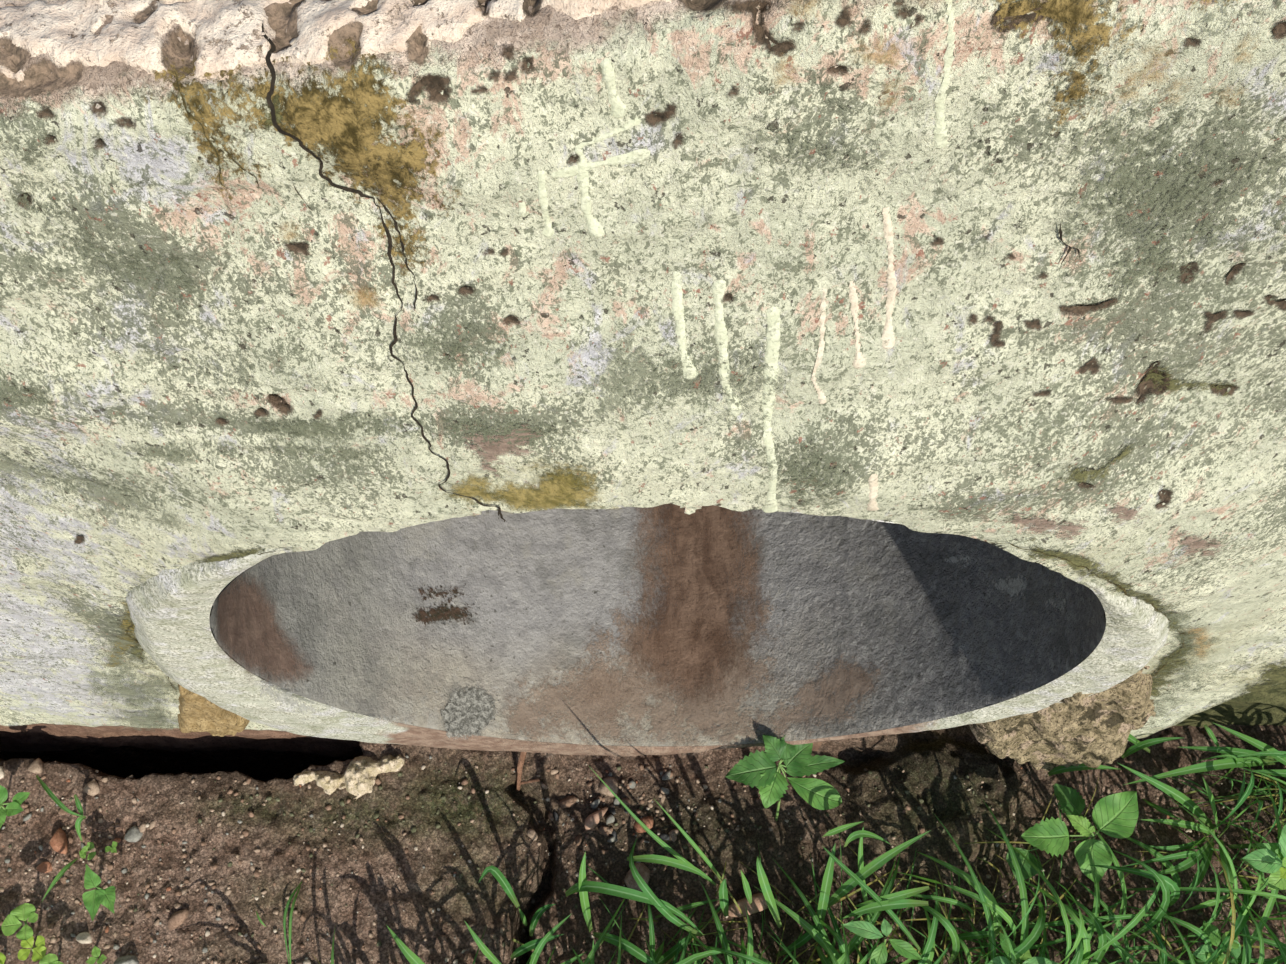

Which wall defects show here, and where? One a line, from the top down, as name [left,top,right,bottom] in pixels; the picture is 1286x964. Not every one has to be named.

crack [176,23,505,522]